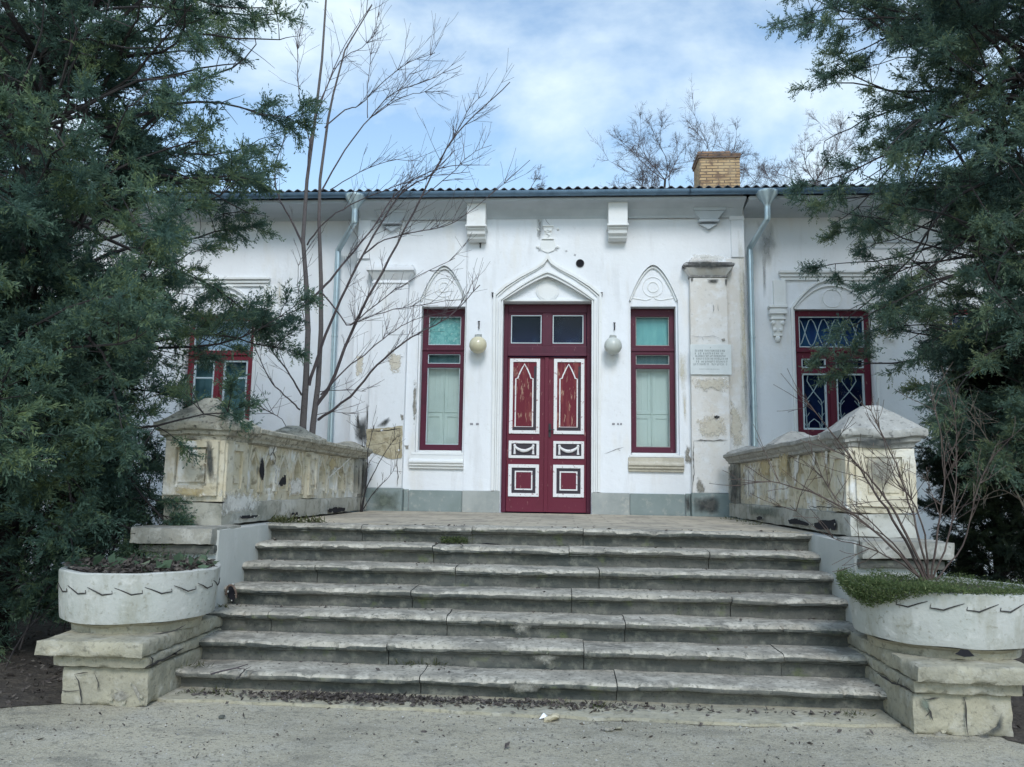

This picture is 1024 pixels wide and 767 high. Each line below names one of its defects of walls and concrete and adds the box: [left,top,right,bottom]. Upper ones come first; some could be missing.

flaking render [366,379,417,459]
peeling [697,399,744,446]
spalling [787,518,836,531]